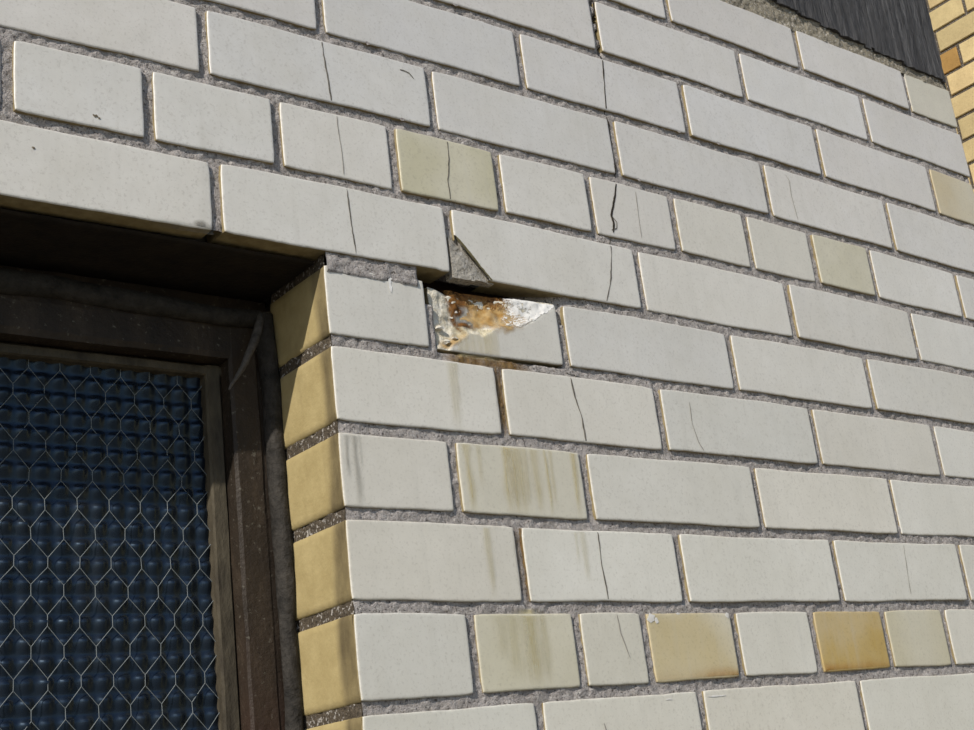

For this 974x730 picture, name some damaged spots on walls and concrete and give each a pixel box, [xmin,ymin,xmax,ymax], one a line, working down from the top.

crack [320,40,356,251]
crack [445,142,453,205]
crack [592,0,642,300]
spalling [424,231,563,368]
crack [571,379,587,444]
crack [595,529,630,657]